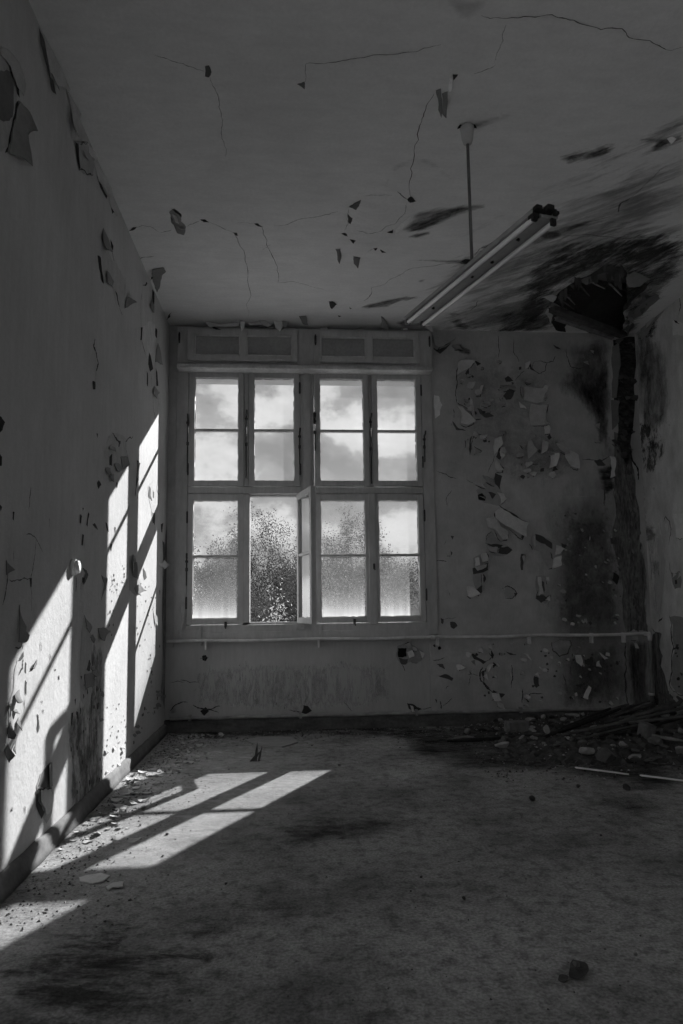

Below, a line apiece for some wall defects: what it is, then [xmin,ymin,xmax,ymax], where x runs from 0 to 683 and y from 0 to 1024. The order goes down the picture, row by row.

crack [474,14,681,74]
peeling [0,46,38,166]
crack [158,56,227,156]
crack [408,94,434,203]
damp [567,148,610,160]
peeling [98,228,166,415]
crack [200,212,334,305]
damp [478,234,681,332]
peeling [97,433,170,569]
flaking render [433,265,683,649]
damp [640,341,664,472]
peeling [396,638,620,712]